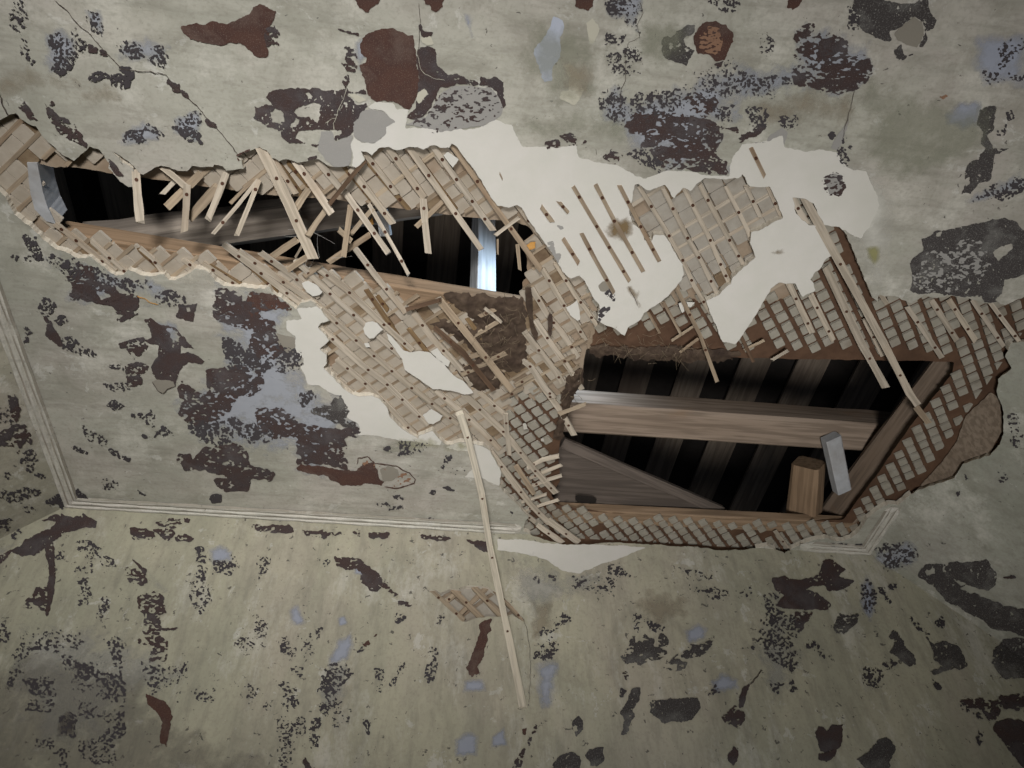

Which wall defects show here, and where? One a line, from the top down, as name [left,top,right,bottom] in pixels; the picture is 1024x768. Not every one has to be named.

crack [56,1,250,161]
peeling [122,111,203,144]
flaking render [254,0,937,344]
peeling [962,106,1024,202]
peeling [910,218,1024,303]
flaking render [10,234,501,511]
peeling [1007,413,1024,448]
peeling [0,394,188,768]
peeling [253,524,390,539]
peeling [685,542,1024,694]